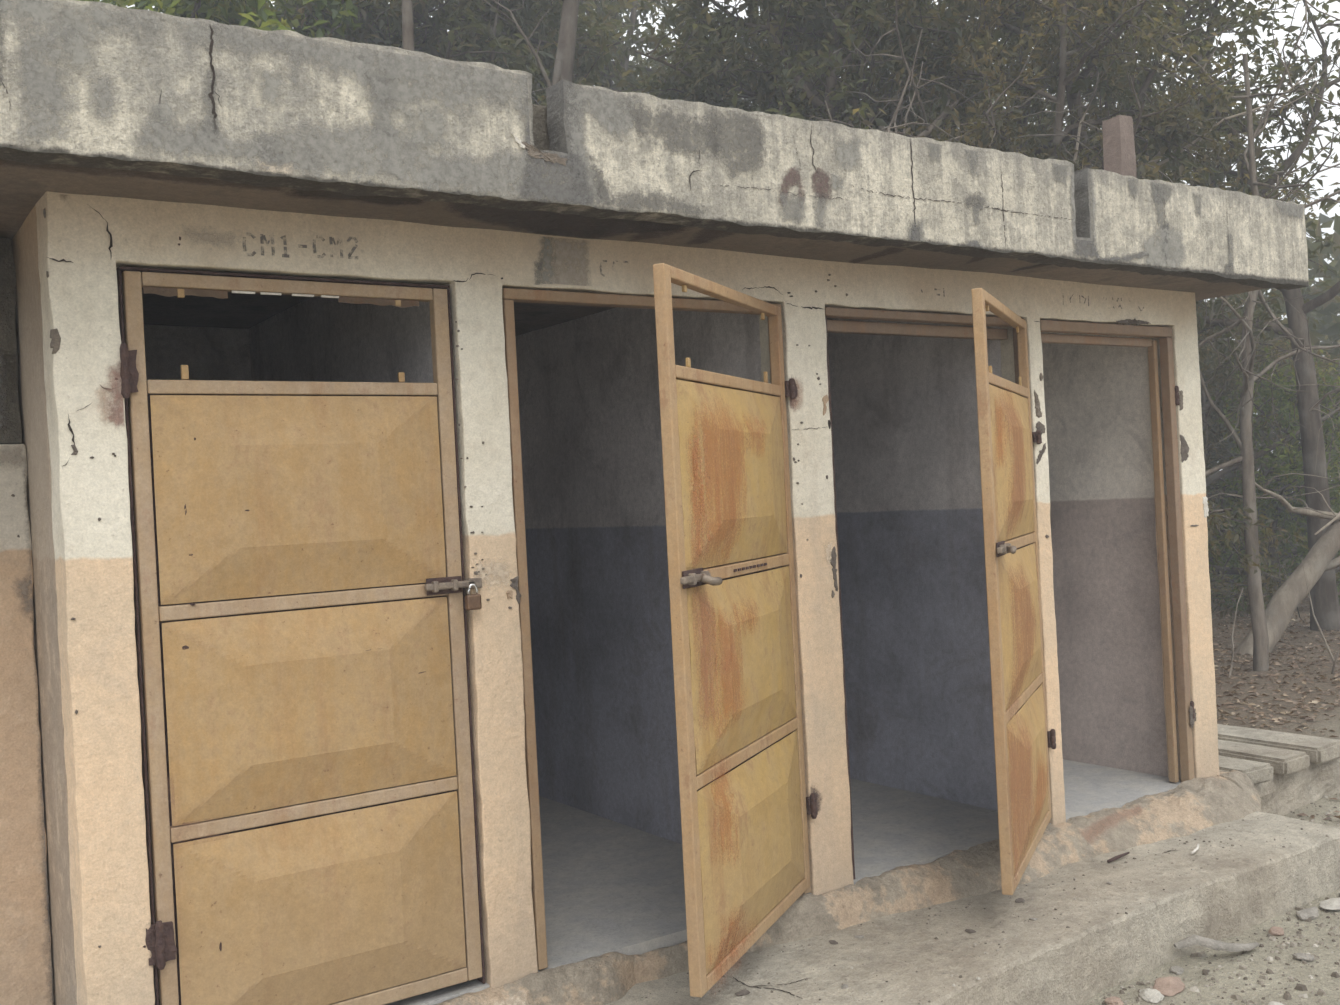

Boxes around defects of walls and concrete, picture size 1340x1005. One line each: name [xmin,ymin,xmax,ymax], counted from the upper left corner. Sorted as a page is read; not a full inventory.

crack [208,26,222,133]
leakage [0,0,765,286]
crack [91,207,113,257]
rust [779,167,844,227]
crack [689,126,1071,244]
leakage [851,221,925,263]
leakage [965,195,985,262]
leakage [1052,163,1185,268]
leakage [1225,234,1235,274]
rust [100,368,124,424]